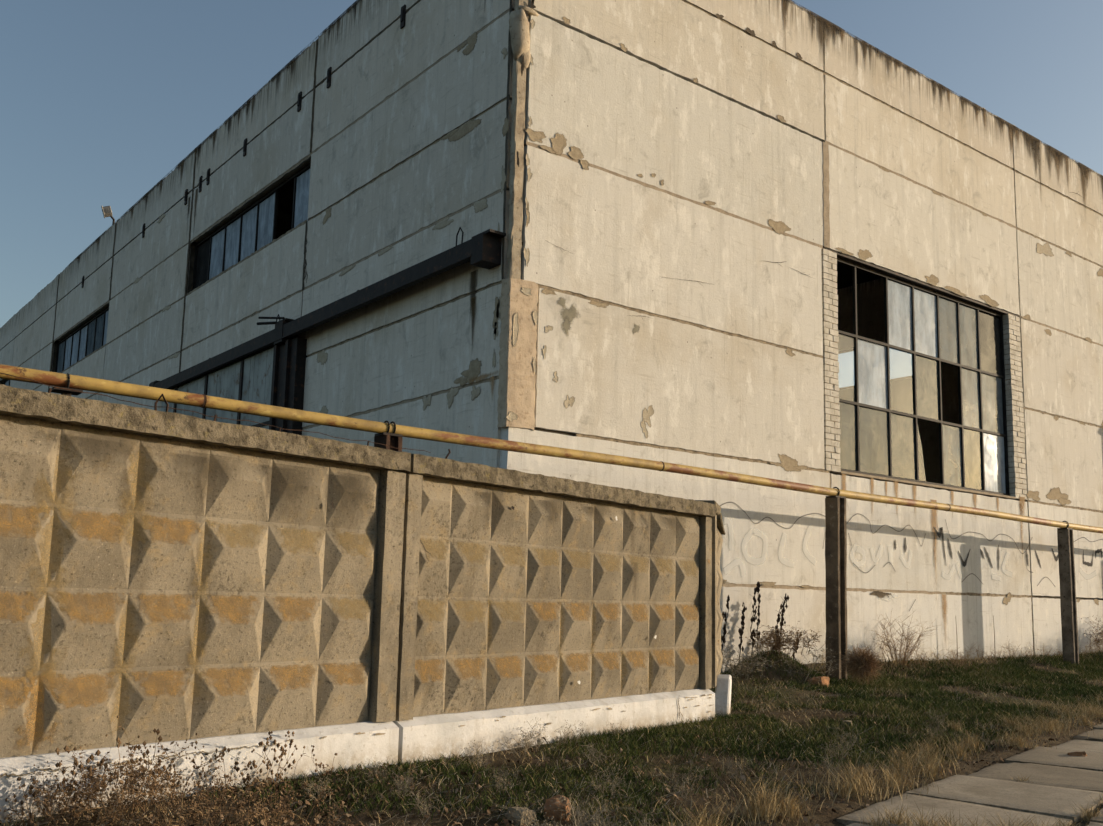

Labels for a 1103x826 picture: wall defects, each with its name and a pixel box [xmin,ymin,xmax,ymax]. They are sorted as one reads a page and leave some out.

damp [783,0,1103,200]
damp [65,0,361,268]
spalling [442,119,481,142]
spalling [526,117,590,170]
spalling [768,219,791,234]
spalling [1036,243,1072,257]
spalling [447,296,502,408]
spalling [641,405,654,438]
spalling [770,454,808,472]
spalling [1027,487,1071,506]